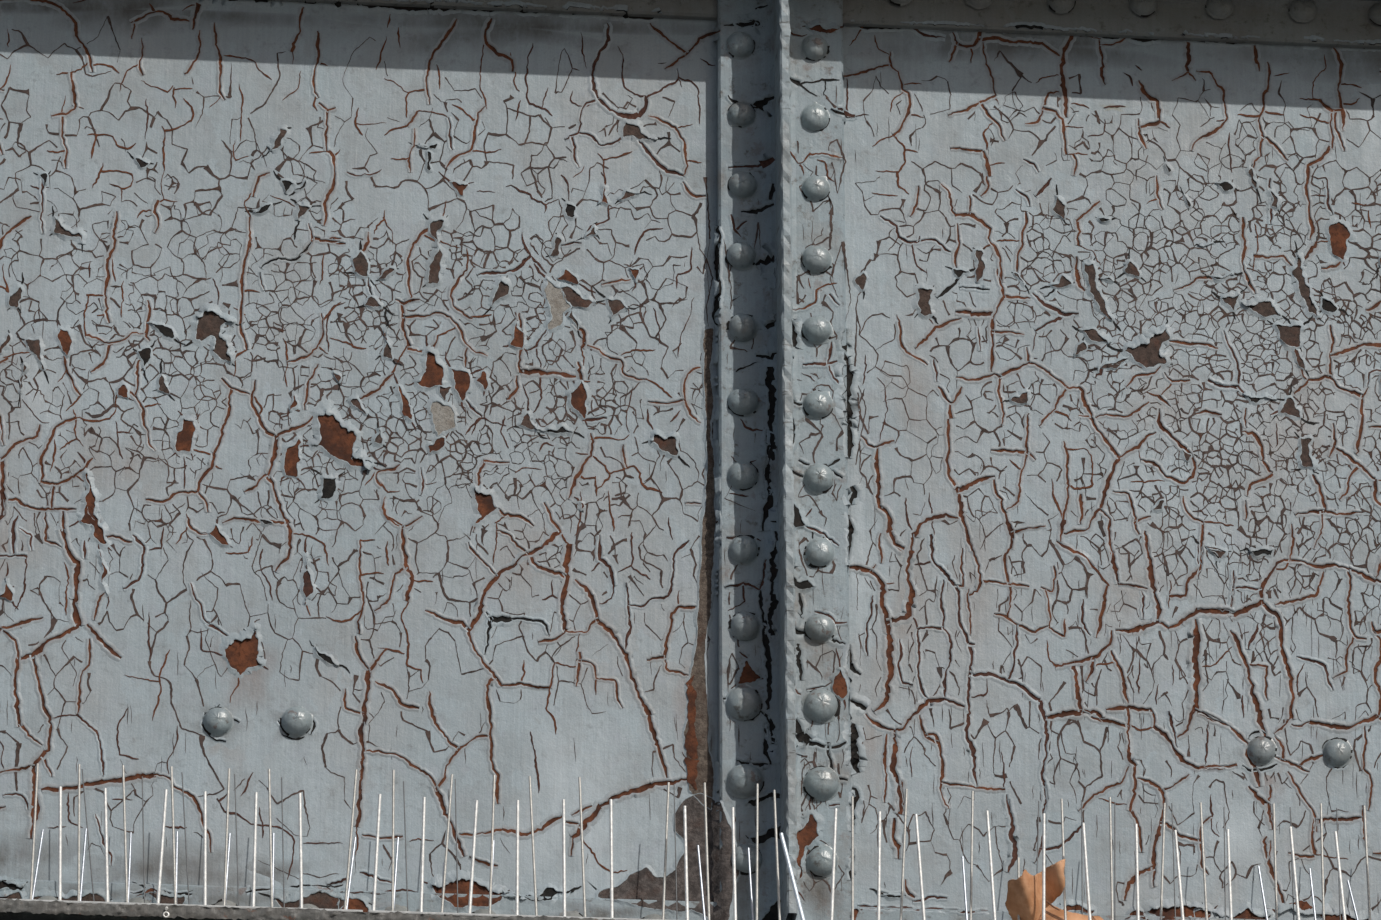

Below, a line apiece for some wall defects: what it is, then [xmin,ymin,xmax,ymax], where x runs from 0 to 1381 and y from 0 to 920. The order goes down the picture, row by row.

peeling [1325,214,1356,265]
peeling [344,240,492,456]
peeling [1012,249,1175,372]
peeling [280,368,387,503]
crack [723,20,1381,917]
peeling [219,619,268,679]
peeling [424,324,825,920]
rust [670,629,696,770]
crack [130,887,193,898]
crack [245,885,270,896]